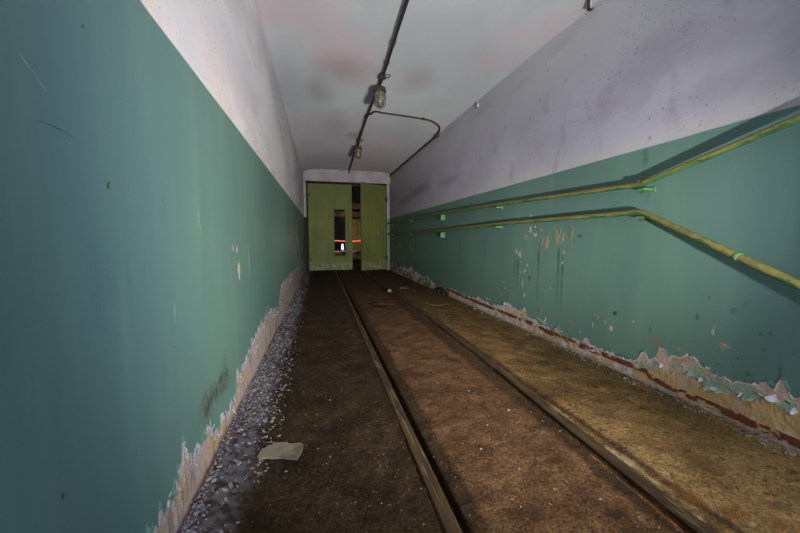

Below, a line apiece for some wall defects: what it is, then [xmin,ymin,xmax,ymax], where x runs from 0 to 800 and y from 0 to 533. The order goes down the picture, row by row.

peeling [449,281,800,452]